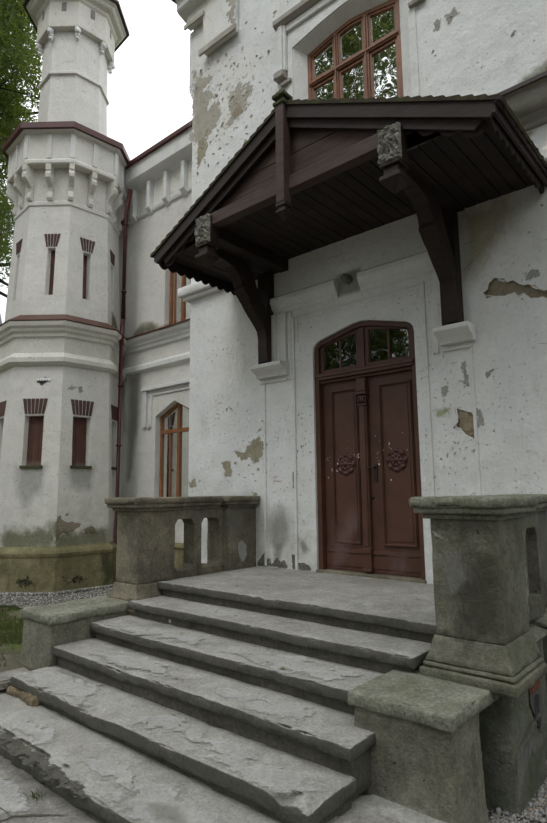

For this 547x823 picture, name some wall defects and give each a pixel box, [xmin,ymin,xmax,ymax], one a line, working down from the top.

peeling [433,7,460,32]
peeling [188,42,270,175]
flaking render [484,269,547,309]
flaking render [443,407,485,438]
peeling [221,420,268,486]
flaking render [55,513,95,542]
flaking render [257,553,311,571]
peeling [0,719,87,799]
peeling [0,771,31,816]